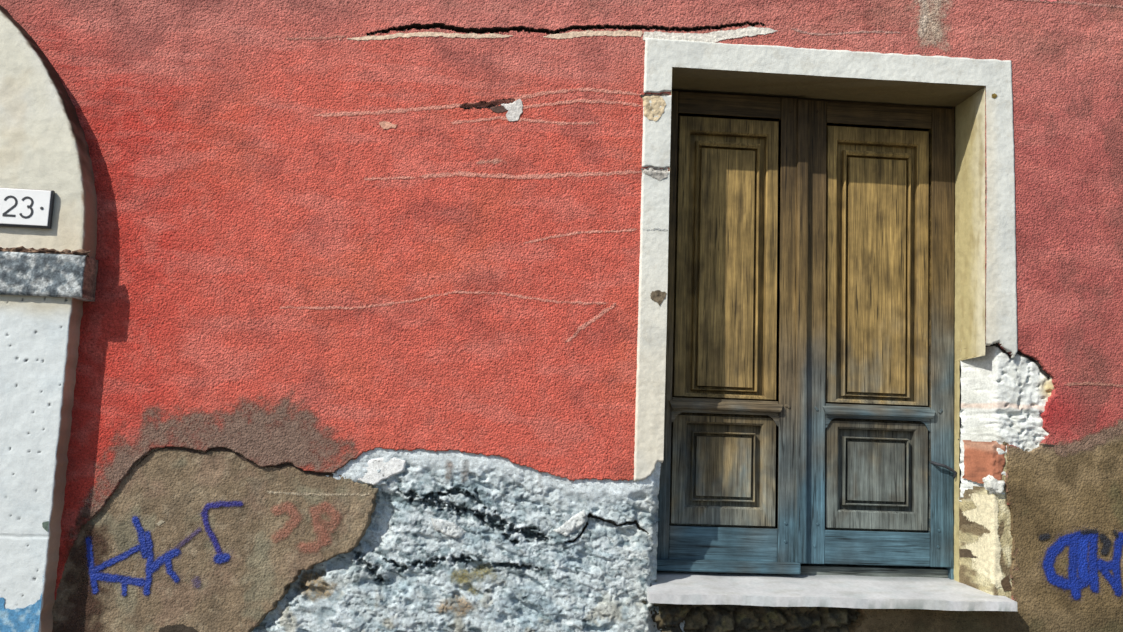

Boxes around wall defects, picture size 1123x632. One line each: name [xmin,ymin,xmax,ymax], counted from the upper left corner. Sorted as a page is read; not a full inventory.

crack [286,21,900,43]
flaking render [640,93,670,121]
crack [1014,0,1123,8]
leakage [54,398,356,632]
flaking render [52,447,666,632]
peeling [847,343,1123,632]